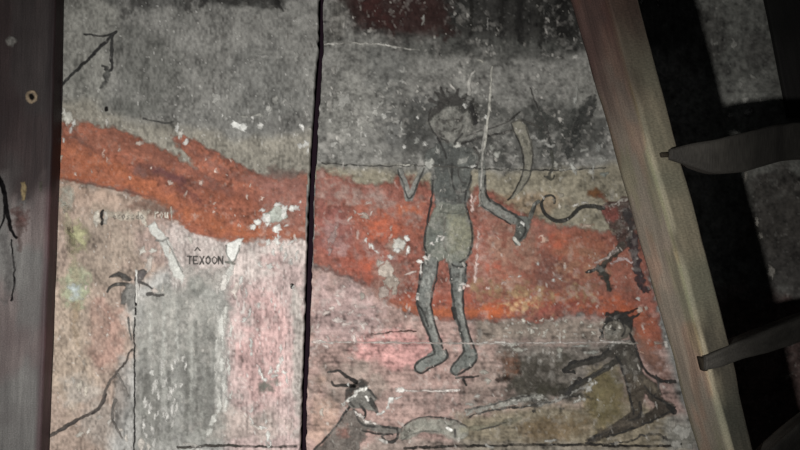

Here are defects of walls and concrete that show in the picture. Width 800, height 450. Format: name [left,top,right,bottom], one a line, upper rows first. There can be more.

peeling [240,197,301,269]
crack [177,0,627,450]
peeling [365,235,444,308]